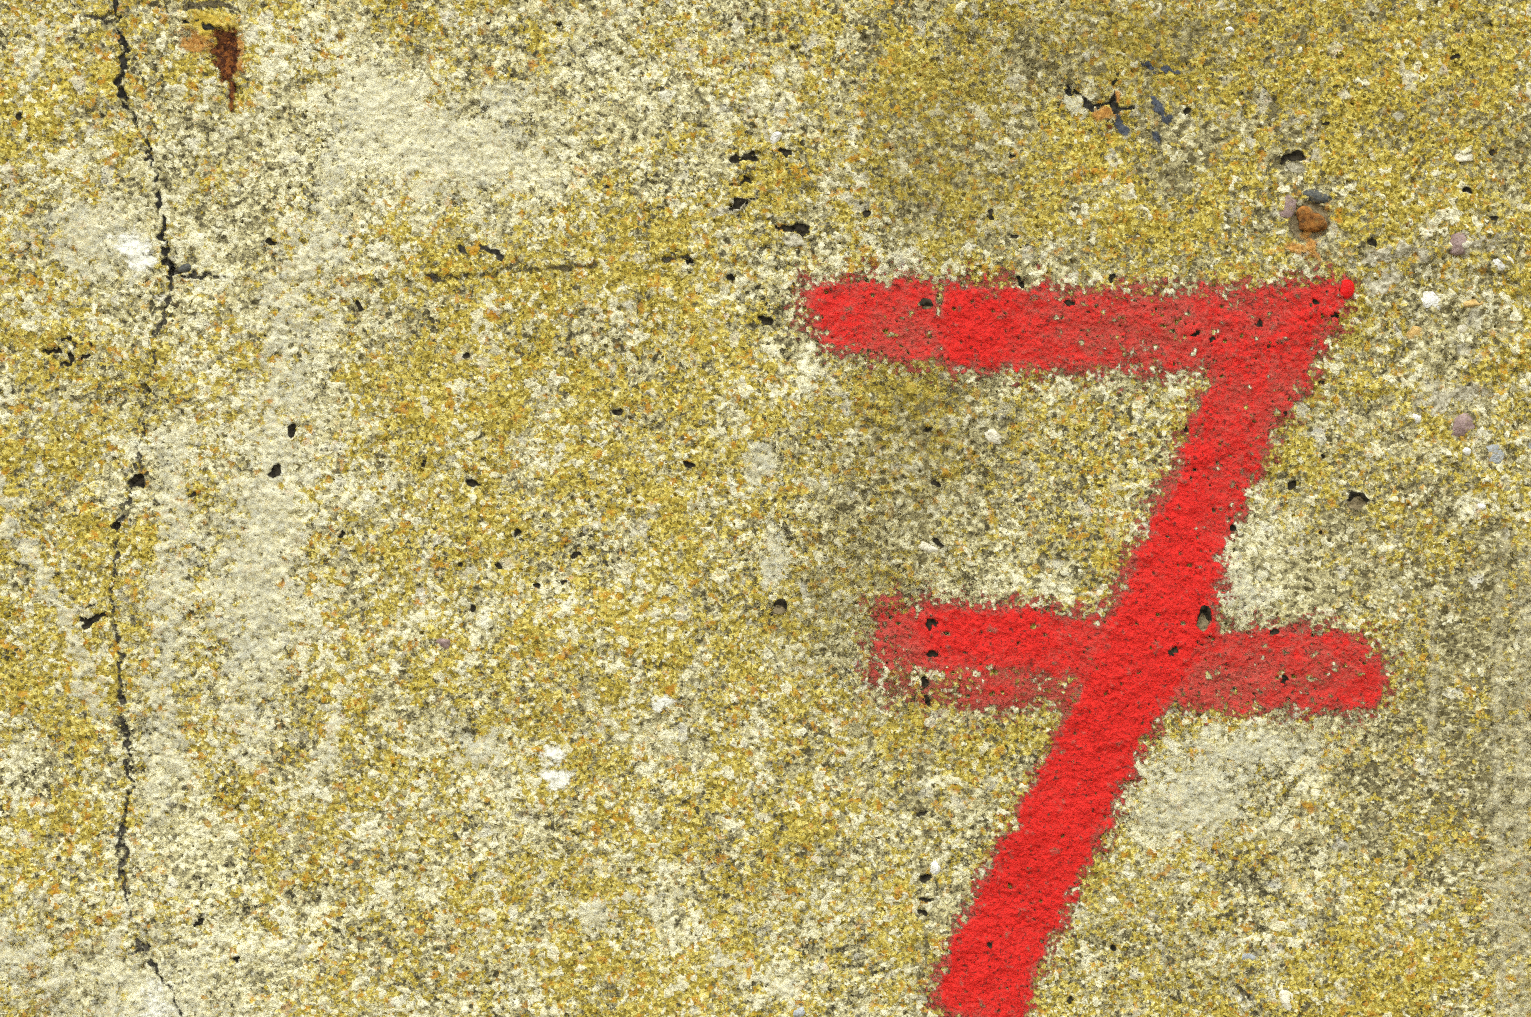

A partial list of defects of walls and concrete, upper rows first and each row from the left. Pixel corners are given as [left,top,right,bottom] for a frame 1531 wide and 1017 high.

corrosion [179,25,245,112]
crack [426,244,598,281]
crack [655,255,694,263]
crack [70,0,225,1016]